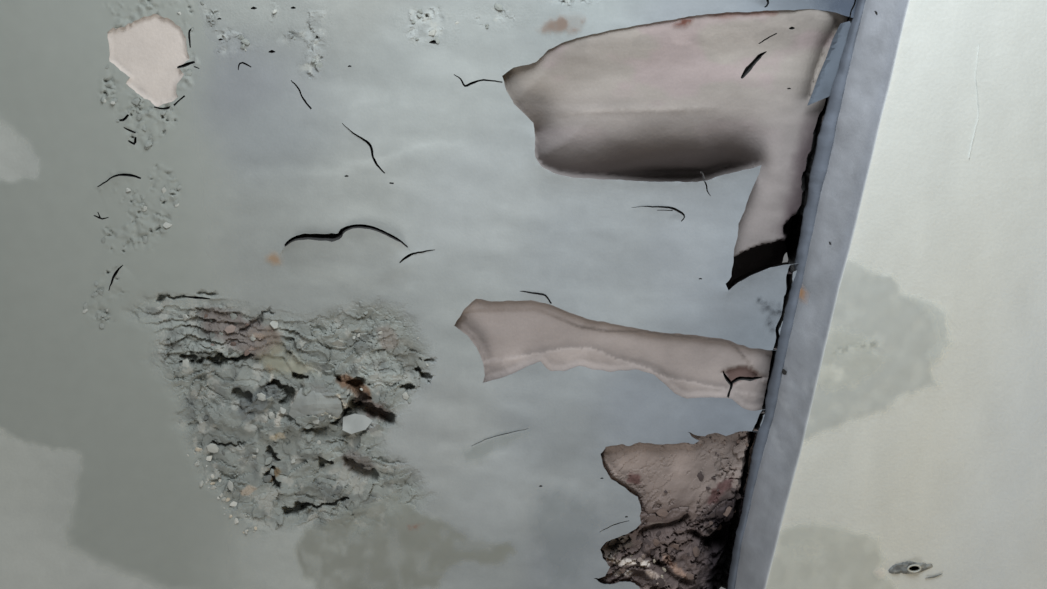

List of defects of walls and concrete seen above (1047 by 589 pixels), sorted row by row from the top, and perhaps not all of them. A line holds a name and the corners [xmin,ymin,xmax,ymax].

peeling [107,14,189,107]
crack [342,123,394,184]
crack [454,74,502,87]
flaking render [502,9,852,290]
water stain [0,0,230,589]
spalling [128,287,442,551]
crack [284,224,433,263]
flaking render [454,299,787,414]
crack [717,97,828,589]
water stain [804,261,948,440]
water stain [296,496,516,589]
flaking render [595,427,758,589]